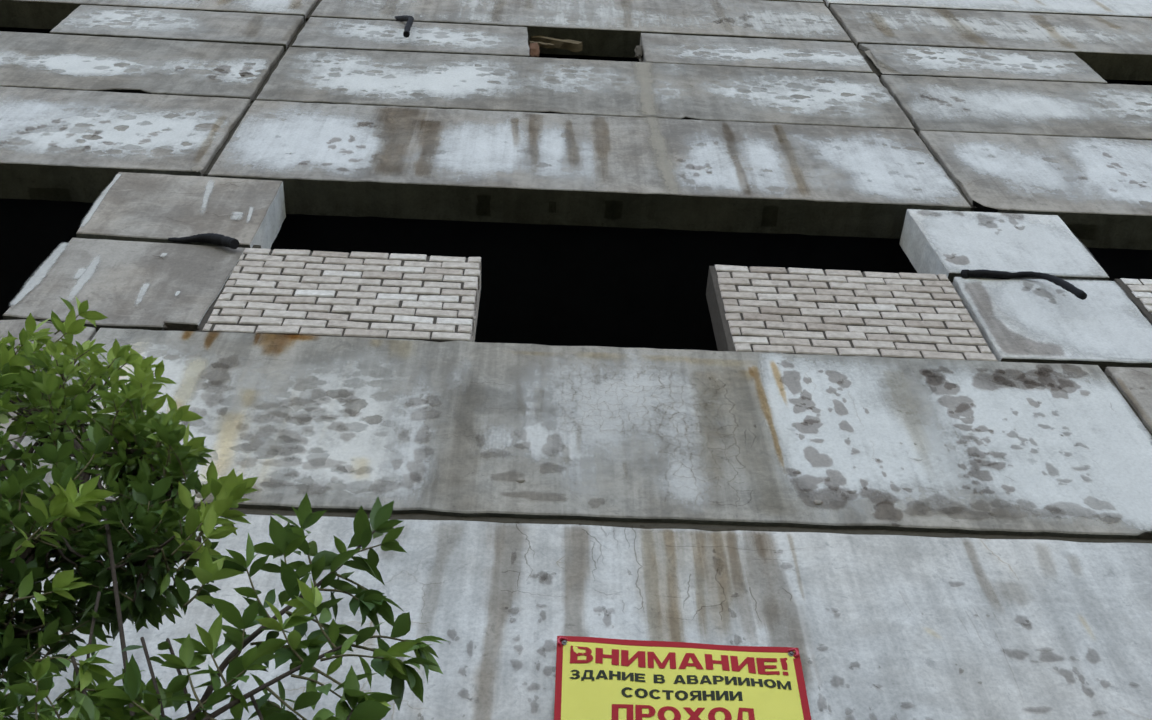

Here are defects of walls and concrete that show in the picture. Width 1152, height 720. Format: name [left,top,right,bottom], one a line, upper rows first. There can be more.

water stain [635,62,678,194]